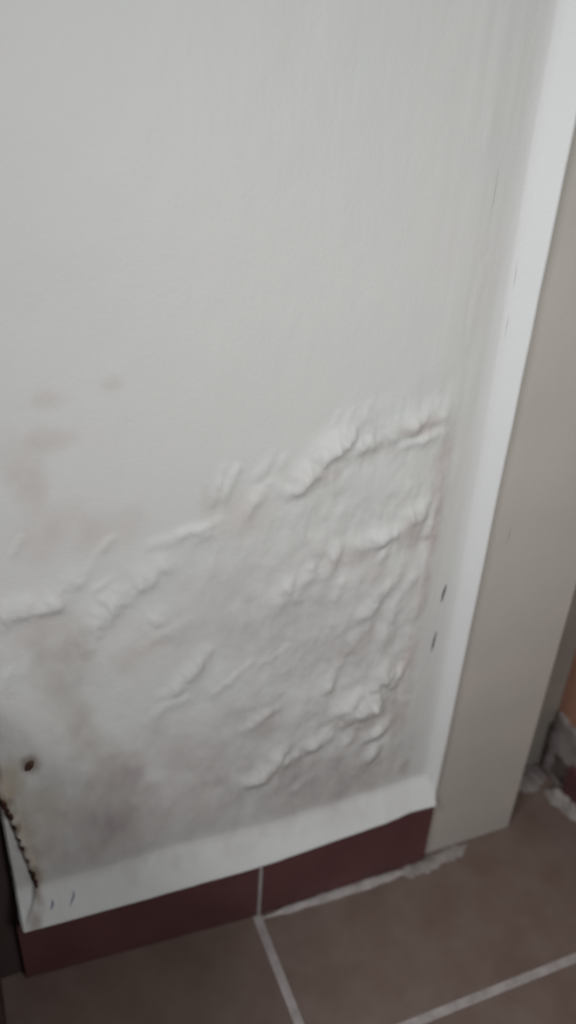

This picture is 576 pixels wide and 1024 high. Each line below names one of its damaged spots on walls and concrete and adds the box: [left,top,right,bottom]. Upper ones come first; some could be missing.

corrosion [0,799,38,888]